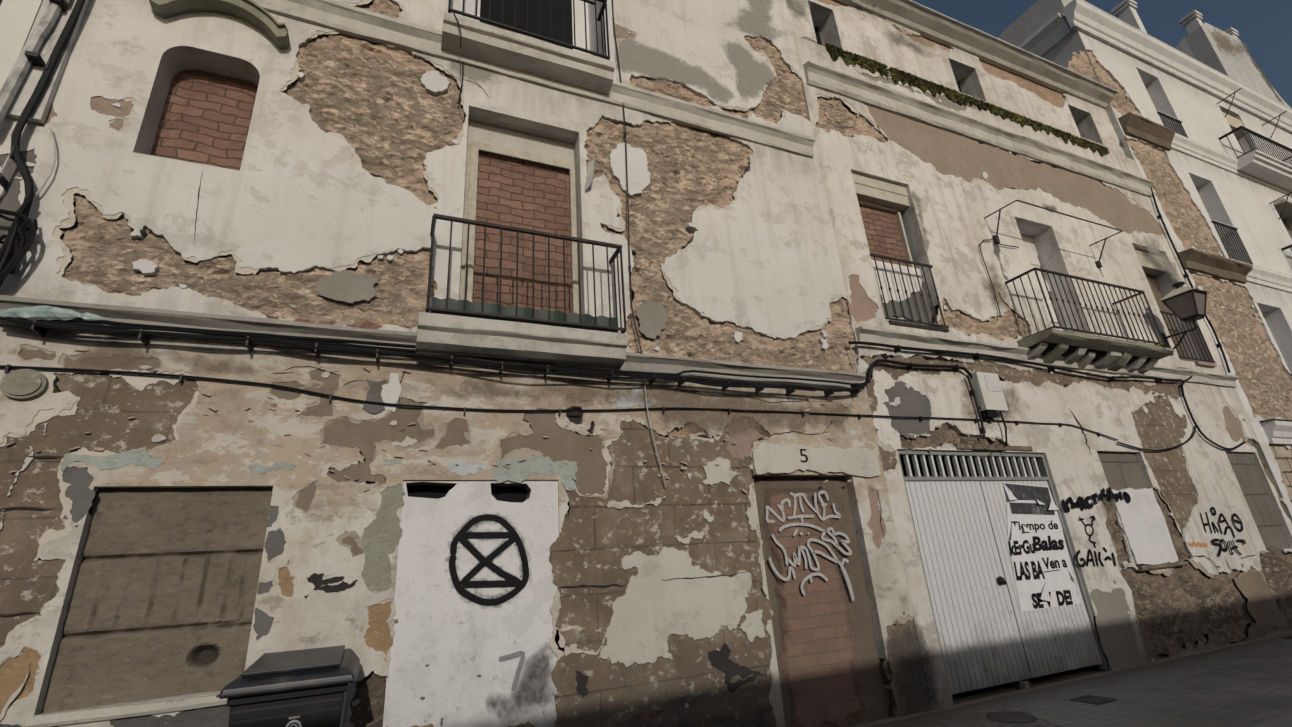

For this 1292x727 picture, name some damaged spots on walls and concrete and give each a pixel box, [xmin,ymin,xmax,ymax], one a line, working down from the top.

flaking render [91,97,136,132]
spalling [280,31,465,209]
flaking render [613,24,638,39]
spalling [52,187,437,329]
spalling [584,115,1292,663]
spalling [0,344,230,727]
spalling [248,367,777,727]